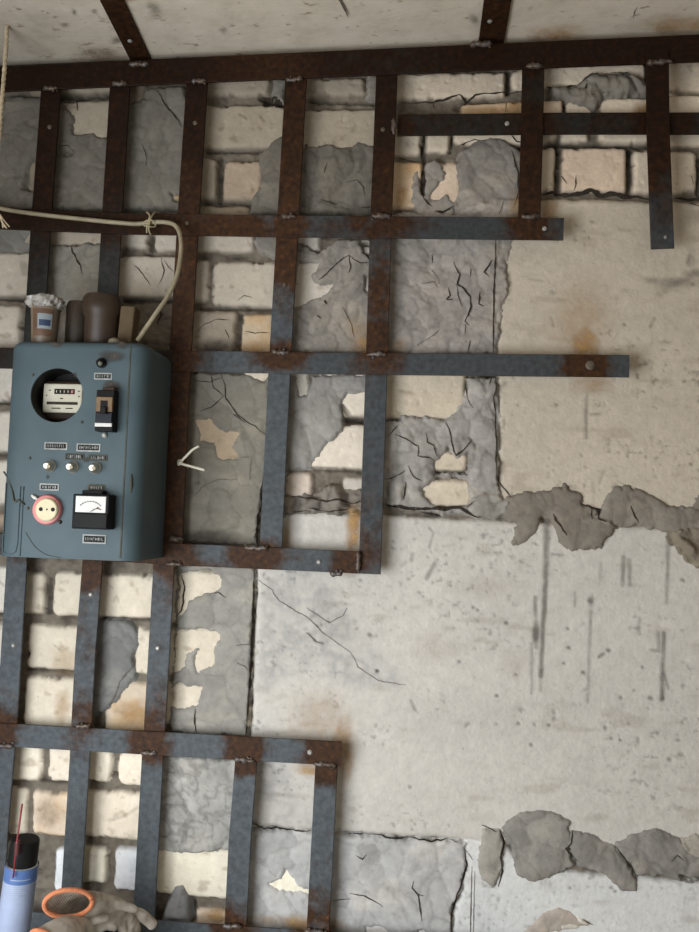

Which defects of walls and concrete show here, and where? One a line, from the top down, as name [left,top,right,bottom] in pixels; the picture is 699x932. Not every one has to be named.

crack [410,72,522,112]
crack [398,136,453,213]
crack [542,176,649,200]
peeling [388,239,512,354]
crack [423,240,496,351]
peeling [383,376,503,519]
corrosion [349,511,360,548]
peeling [169,566,258,736]
crack [236,569,402,733]
water stain [533,564,547,675]
peeling [247,825,312,929]
peeling [329,831,467,932]